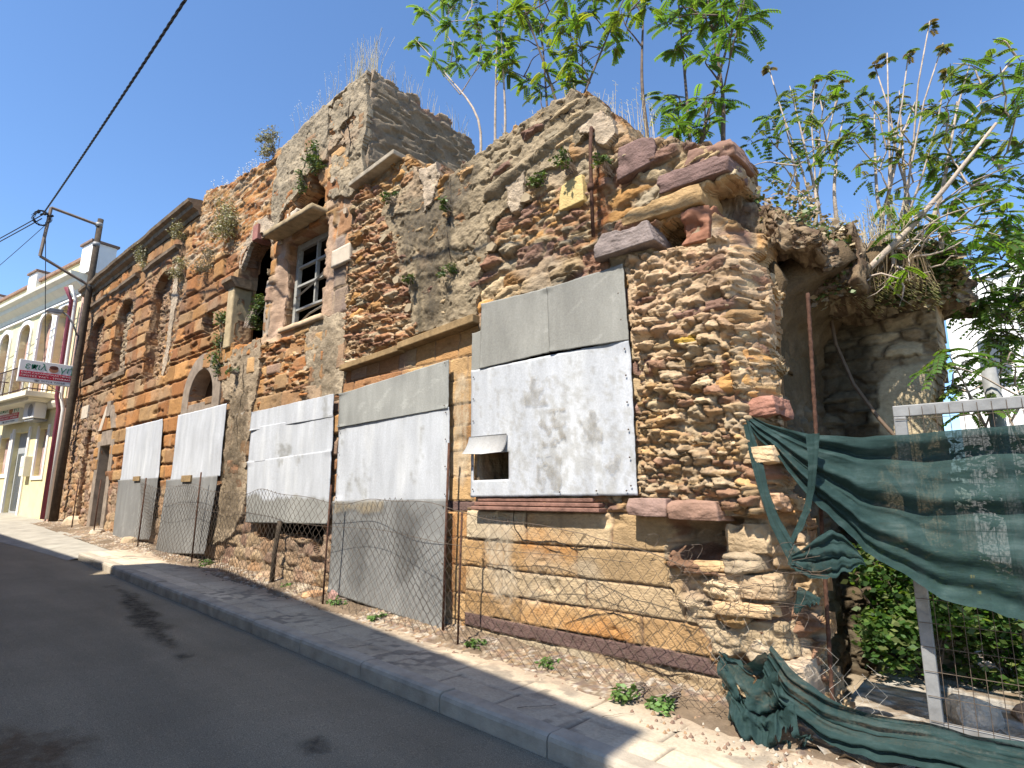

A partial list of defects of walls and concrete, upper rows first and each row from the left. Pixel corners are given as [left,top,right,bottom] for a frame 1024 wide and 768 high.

flaking render [213,70,618,545]